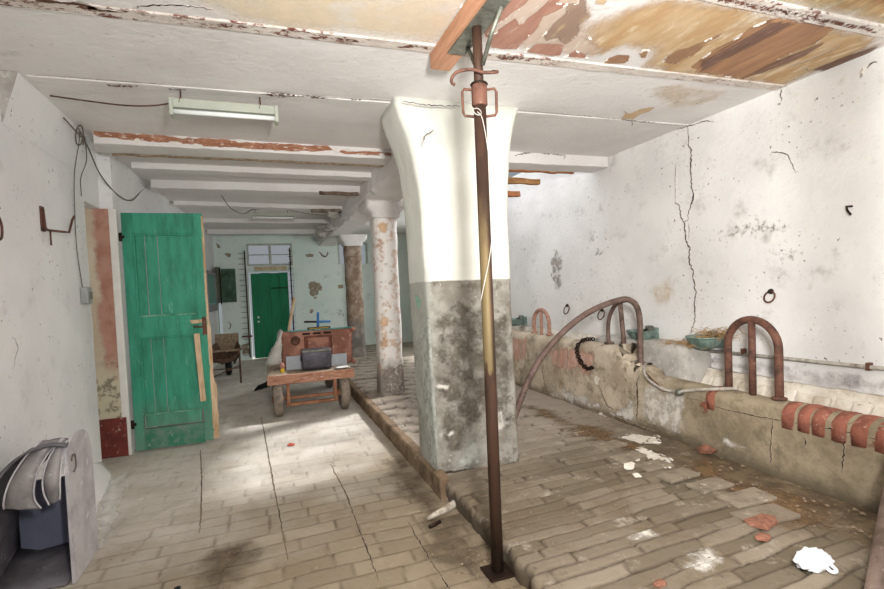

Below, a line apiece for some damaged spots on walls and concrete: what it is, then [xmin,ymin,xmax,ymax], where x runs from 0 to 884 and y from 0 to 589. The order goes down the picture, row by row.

flaking render [35,0,129,12]
flaking render [484,0,650,64]
flaking render [662,18,835,79]
flaking render [814,47,877,77]
crack [244,92,461,107]
crack [770,151,798,173]
crack [524,110,714,334]
crack [687,397,875,473]
crack [330,464,379,581]
leakage [203,543,254,585]
crack [408,522,450,589]